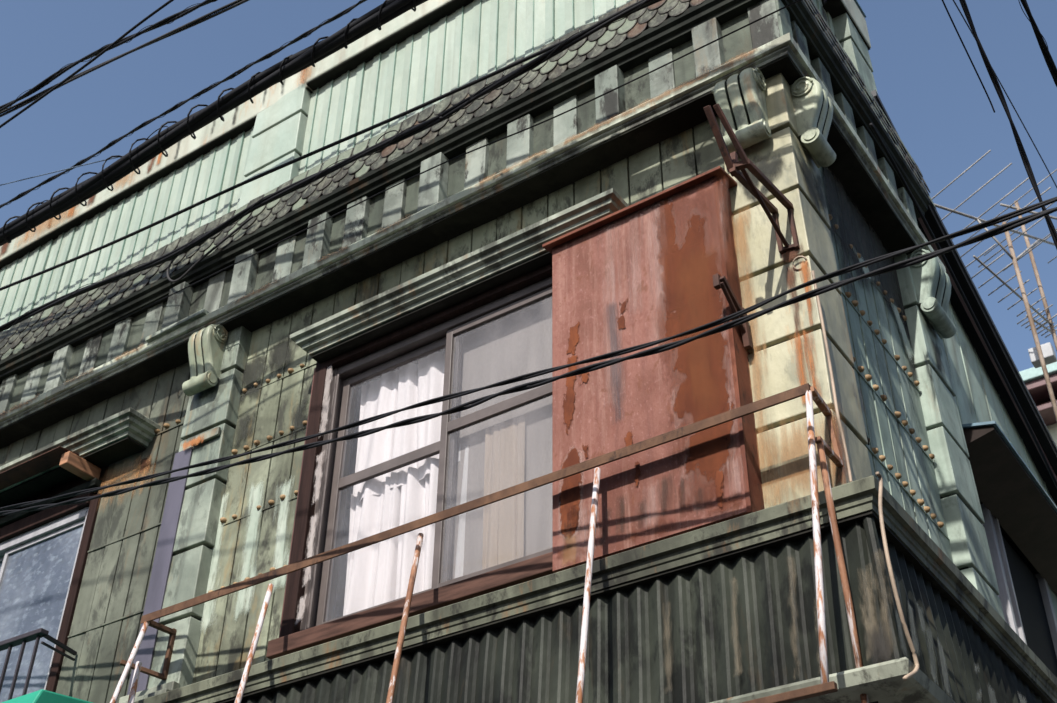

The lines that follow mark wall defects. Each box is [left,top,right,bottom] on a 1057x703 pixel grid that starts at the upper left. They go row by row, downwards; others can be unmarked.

leakage [739,156,782,199]
leakage [800,159,827,221]
rust [616,299,628,330]
rust [782,249,820,403]
rust [563,322,590,434]
rust [559,445,588,539]